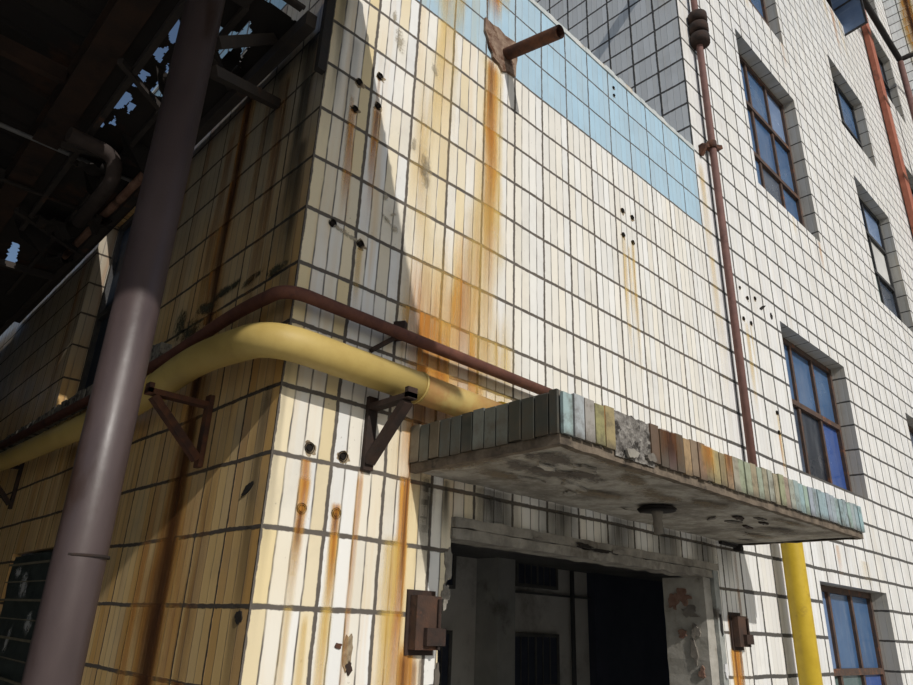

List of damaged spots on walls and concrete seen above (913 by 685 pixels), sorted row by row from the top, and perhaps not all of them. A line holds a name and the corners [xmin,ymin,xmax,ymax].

rust [901,0,913,44]
rust [485,63,500,229]
spalling [614,410,657,468]
spalling [334,634,353,676]
peeling [668,588,706,679]
rust [732,650,744,685]